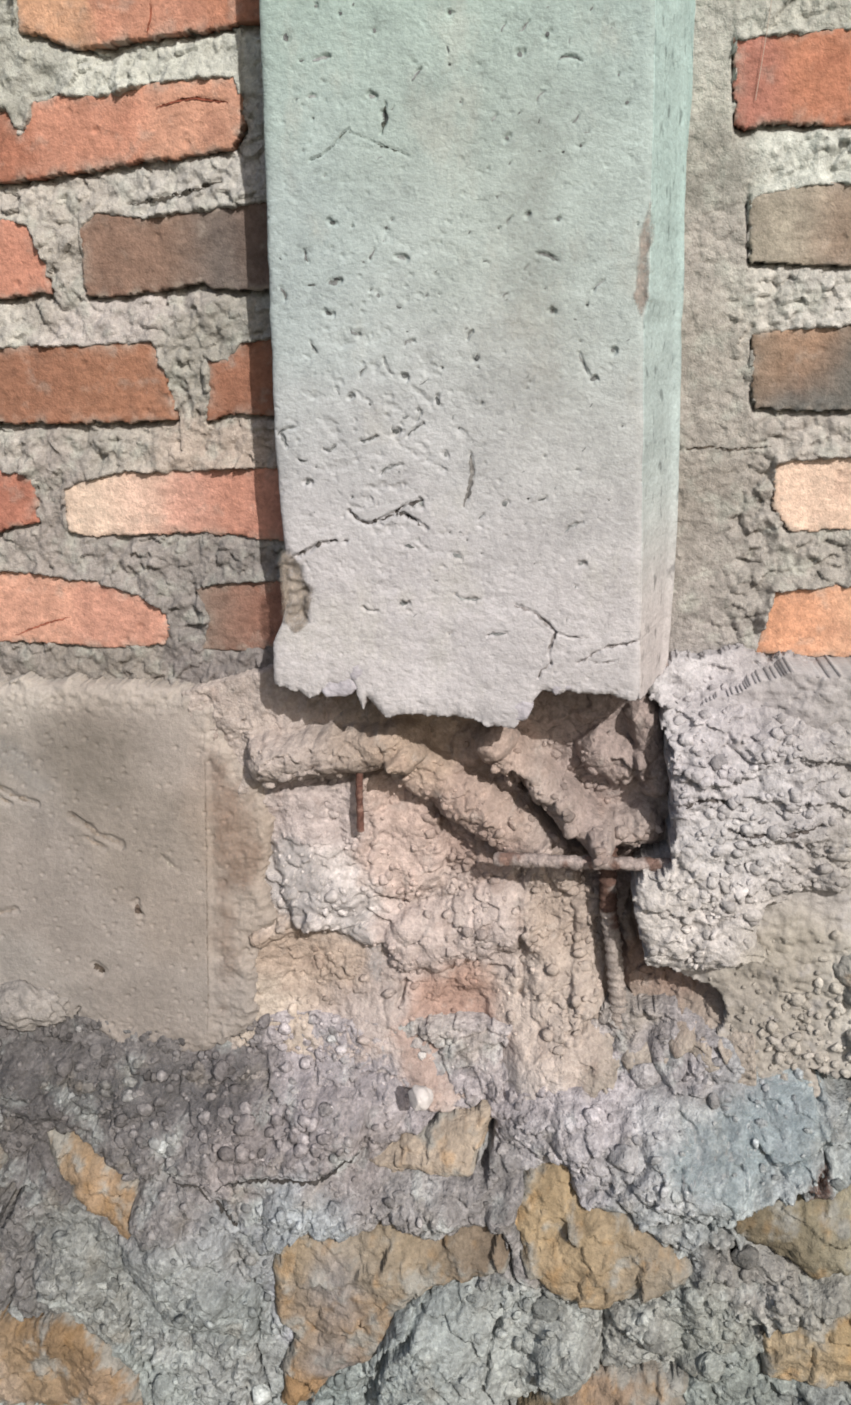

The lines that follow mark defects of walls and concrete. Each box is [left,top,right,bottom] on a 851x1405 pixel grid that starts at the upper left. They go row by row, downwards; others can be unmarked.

crack [514,605,638,678]
spalling [182,643,851,1113]